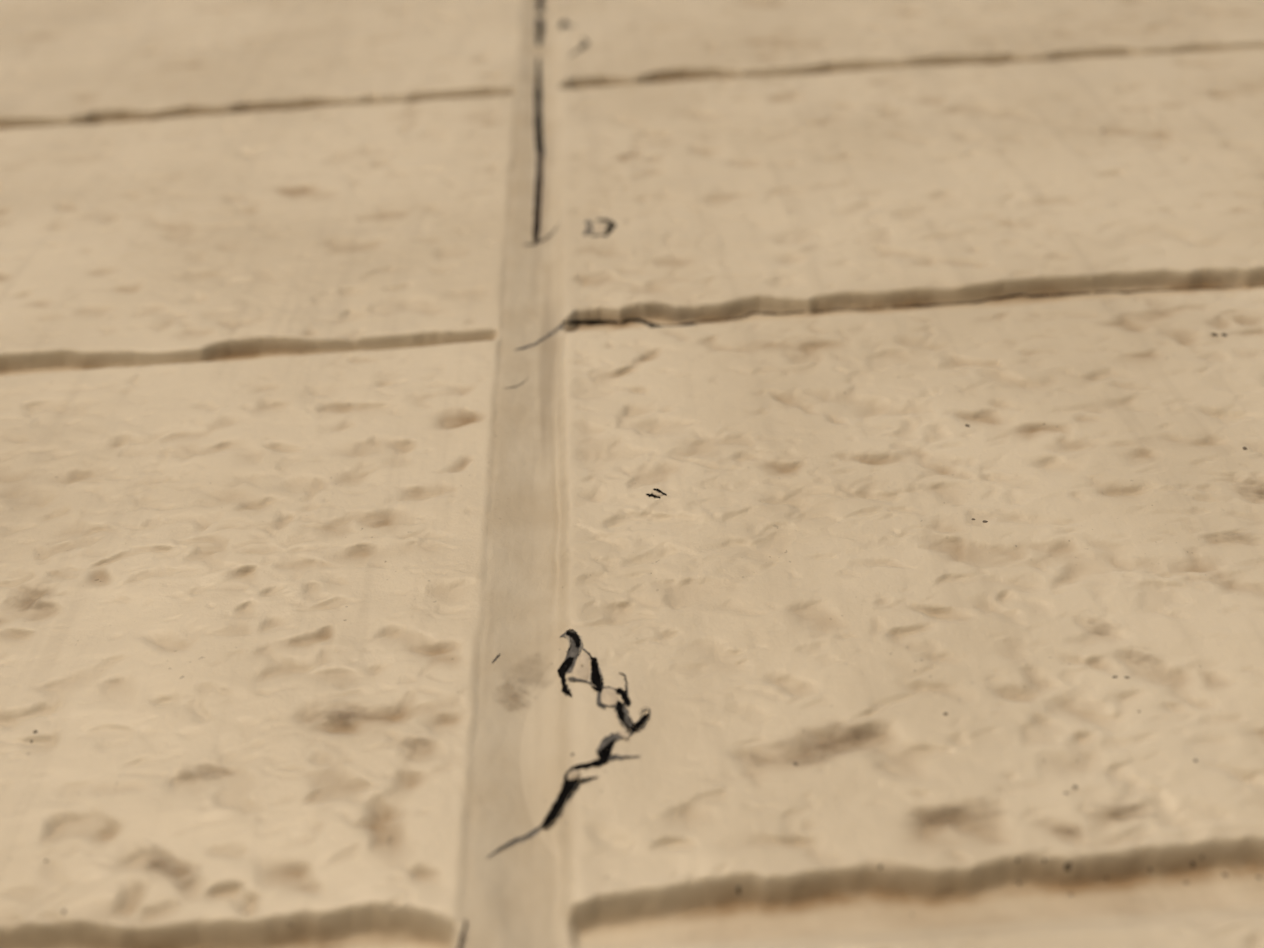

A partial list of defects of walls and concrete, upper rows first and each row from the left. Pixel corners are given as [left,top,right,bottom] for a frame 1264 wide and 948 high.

crack [515,285,1264,351]
crack [487,629,650,858]